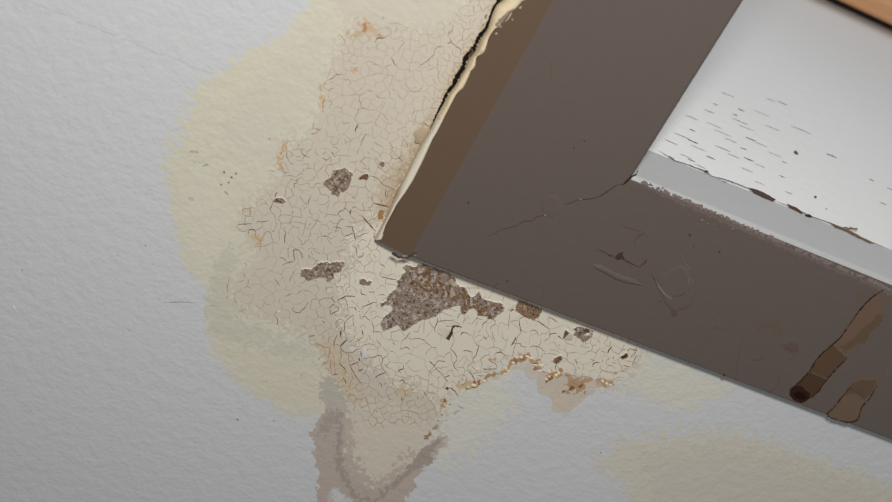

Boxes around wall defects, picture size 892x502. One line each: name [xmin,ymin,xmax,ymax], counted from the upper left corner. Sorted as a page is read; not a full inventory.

spalling [299,260,346,283]
leakage [152,0,535,502]
spalling [323,166,370,197]
crack [207,0,651,447]
spalling [380,262,543,331]
leakage [789,290,892,403]
leakage [536,323,892,502]